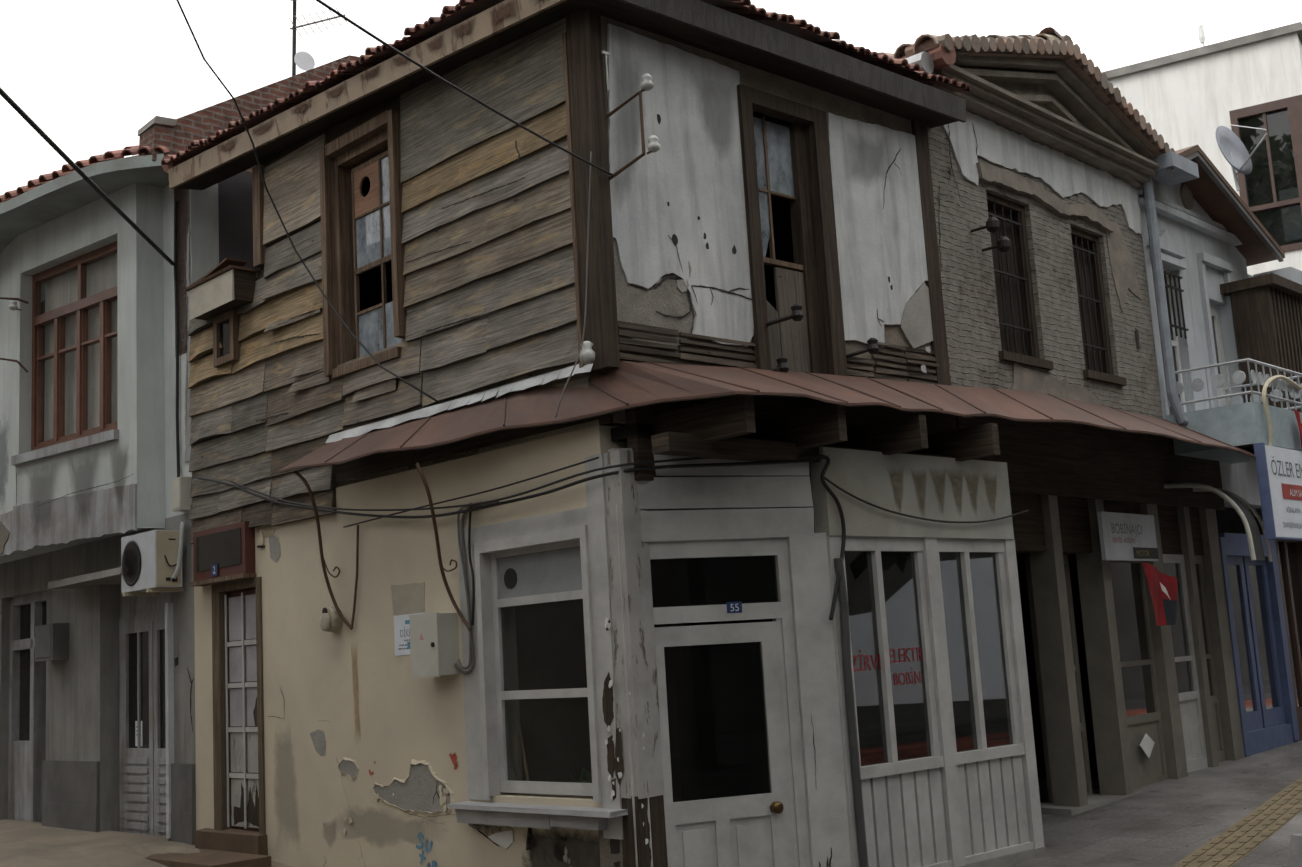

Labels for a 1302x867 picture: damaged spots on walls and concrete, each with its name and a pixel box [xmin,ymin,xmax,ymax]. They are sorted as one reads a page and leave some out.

spalling [613,240,757,369]
spalling [846,185,999,389]
spalling [336,757,359,781]
spalling [371,759,455,816]
peeling [602,672,624,801]